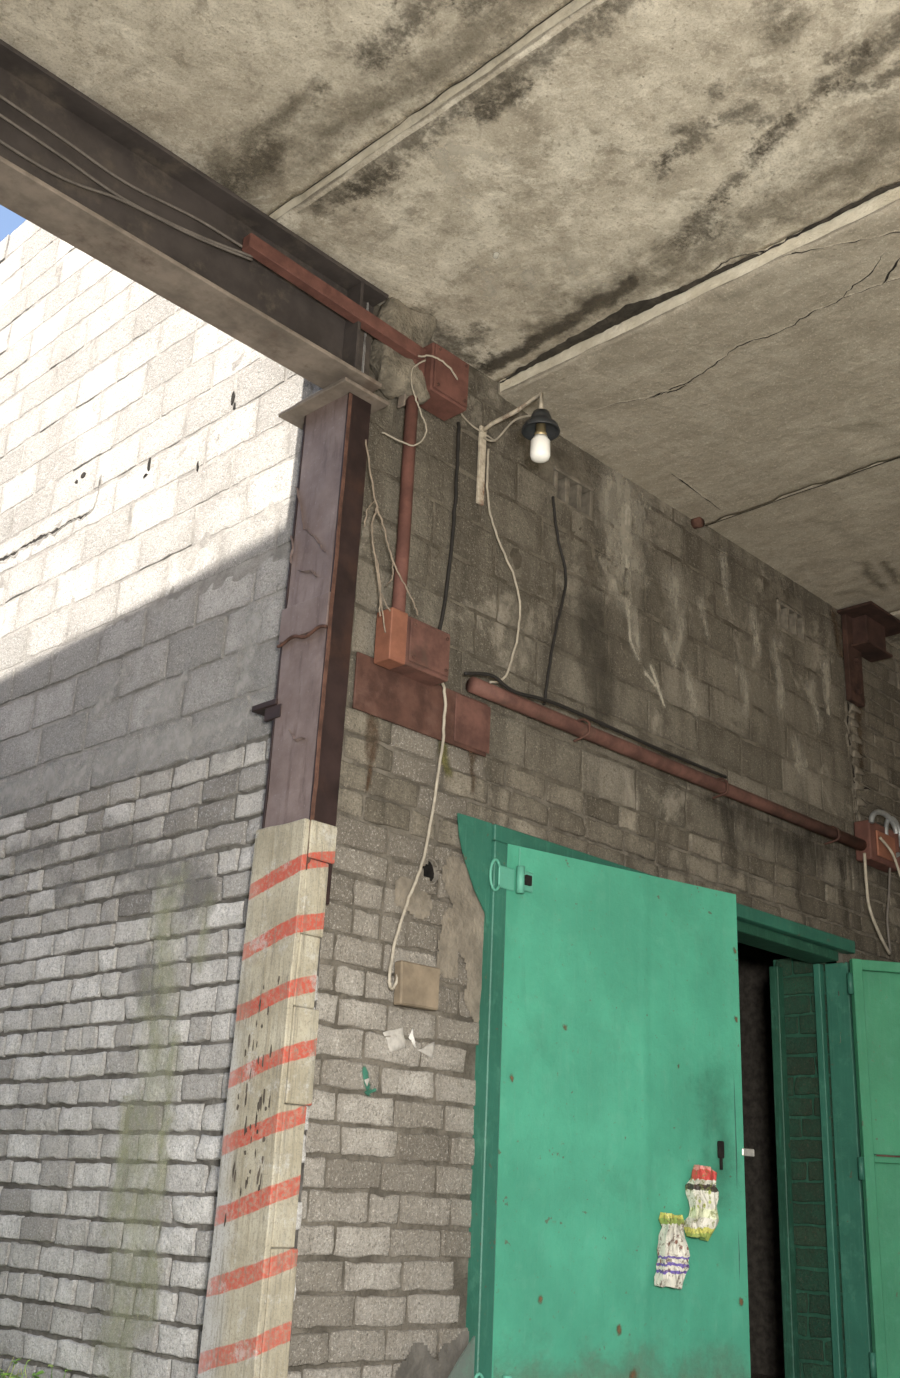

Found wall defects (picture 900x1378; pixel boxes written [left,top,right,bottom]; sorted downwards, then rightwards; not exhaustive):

water stain [315,0,624,211]
crack [589,230,900,411]
water stain [580,593,611,722]
water stain [601,471,665,706]
water stain [664,574,696,710]
water stain [751,615,784,711]
water stain [806,661,830,721]